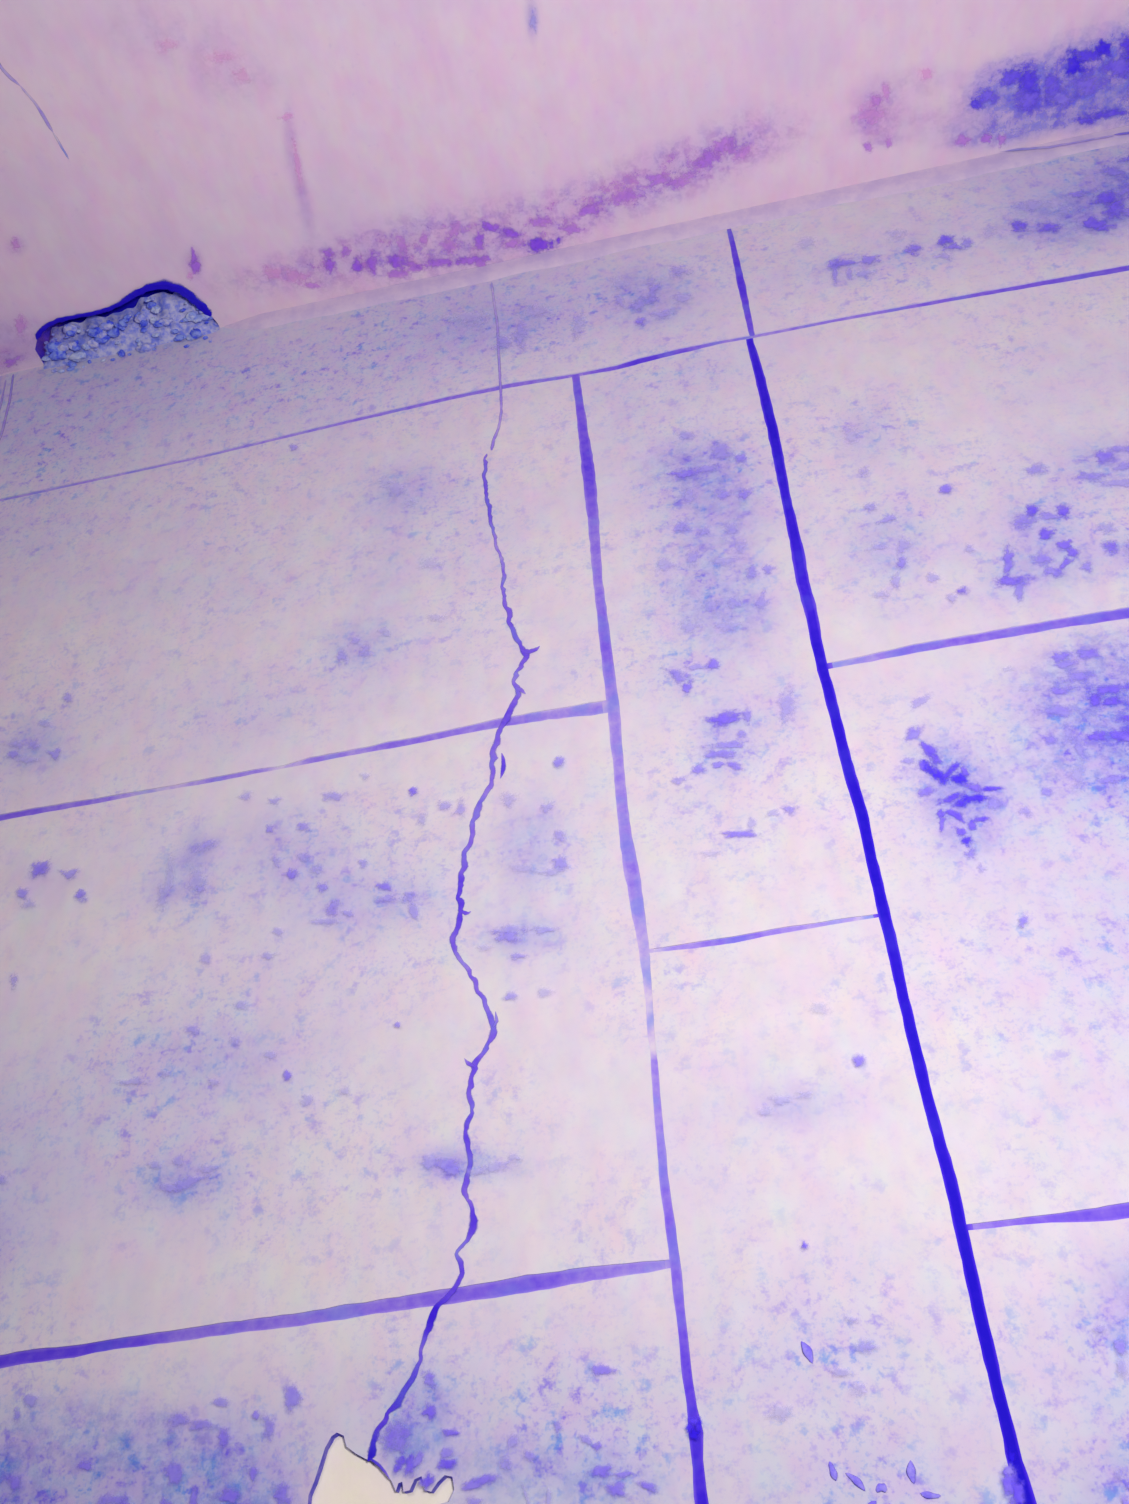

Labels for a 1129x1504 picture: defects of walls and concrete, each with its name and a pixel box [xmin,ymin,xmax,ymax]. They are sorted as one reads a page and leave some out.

damp [956,35,1129,144]
damp [289,137,750,288]
flaking render [35,280,220,373]
crack [367,282,540,1479]